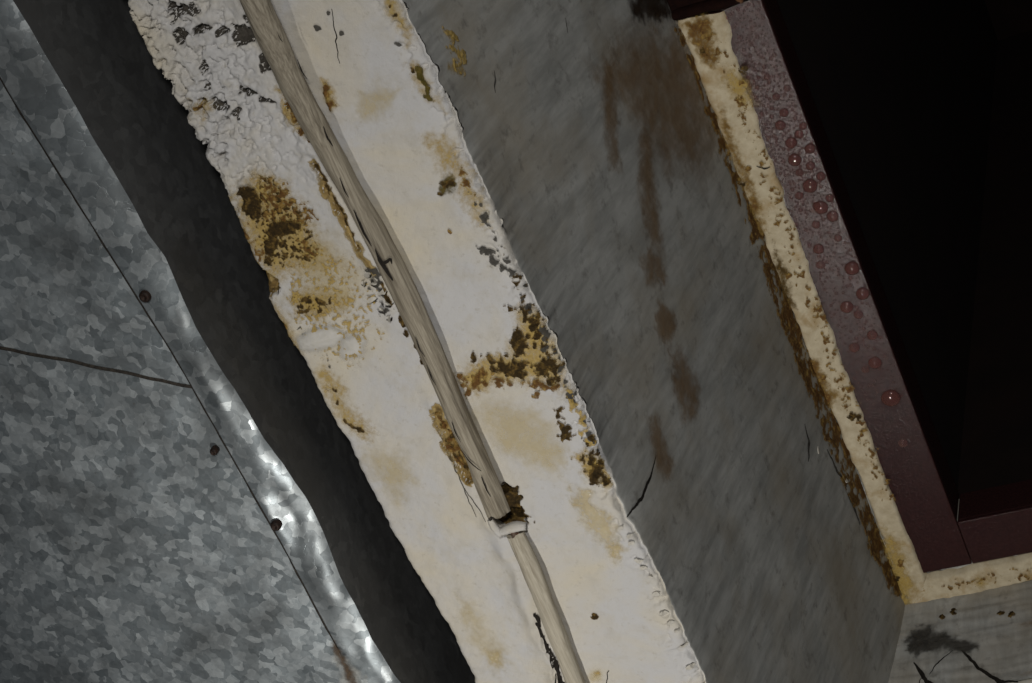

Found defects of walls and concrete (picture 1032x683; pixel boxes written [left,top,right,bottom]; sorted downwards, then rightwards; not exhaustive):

spalling [168,0,256,47]
damp [632,0,672,22]
spalling [259,53,271,74]
spalling [199,59,242,120]
spalling [239,85,277,103]
damp [437,175,456,196]
damp [236,174,384,367]
corrosion [674,15,913,604]
damp [457,192,619,557]
crack [914,650,1018,683]